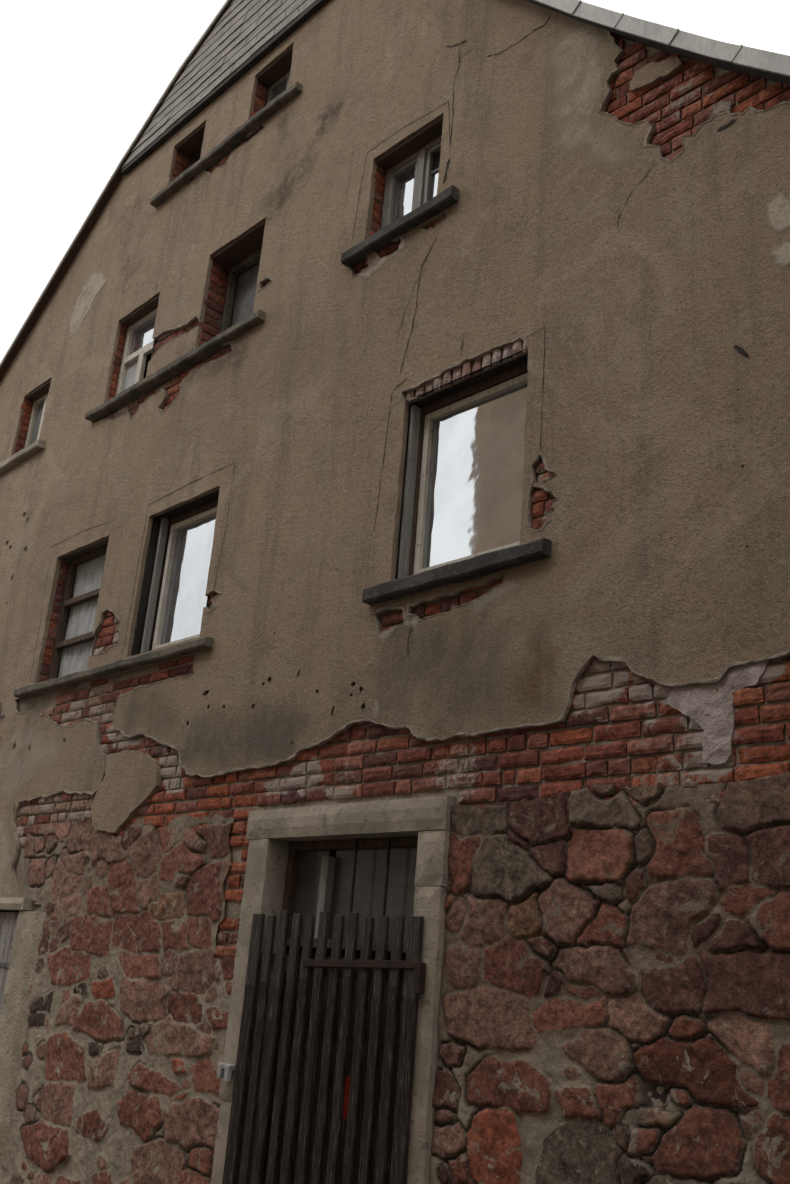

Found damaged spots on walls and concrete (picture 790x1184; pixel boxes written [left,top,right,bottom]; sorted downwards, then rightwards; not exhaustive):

crack [443,14,552,184]
spalling [598,30,790,163]
spalling [92,307,233,424]
crack [397,238,436,383]
spalling [526,453,559,532]
spalling [91,609,120,656]
spalling [205,590,221,613]
spalling [374,573,505,635]
spalling [0,650,790,869]